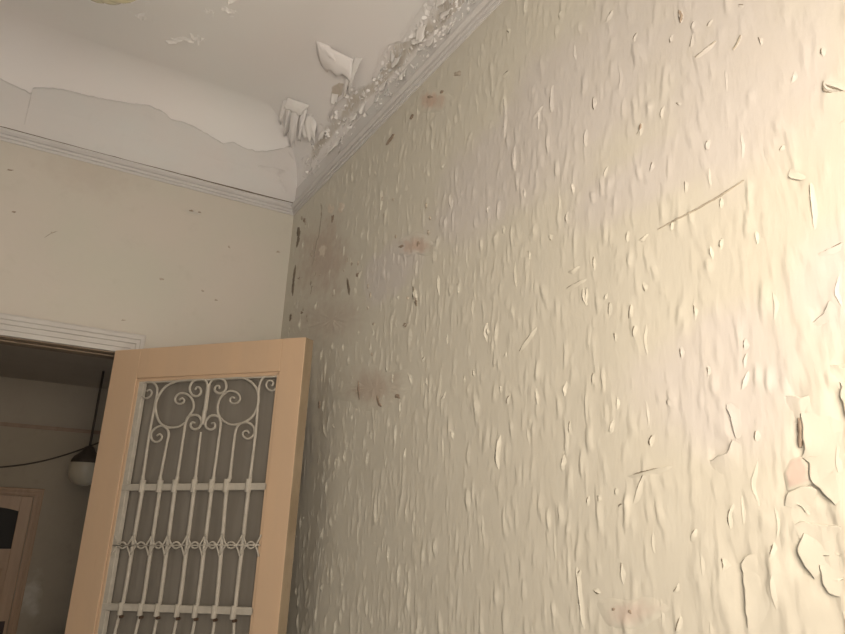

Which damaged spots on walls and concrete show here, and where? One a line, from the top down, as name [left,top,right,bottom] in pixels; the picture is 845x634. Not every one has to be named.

spalling [279,0,476,179]
peeling [822,80,845,93]
peeling [783,382,845,515]
peeling [797,533,845,597]